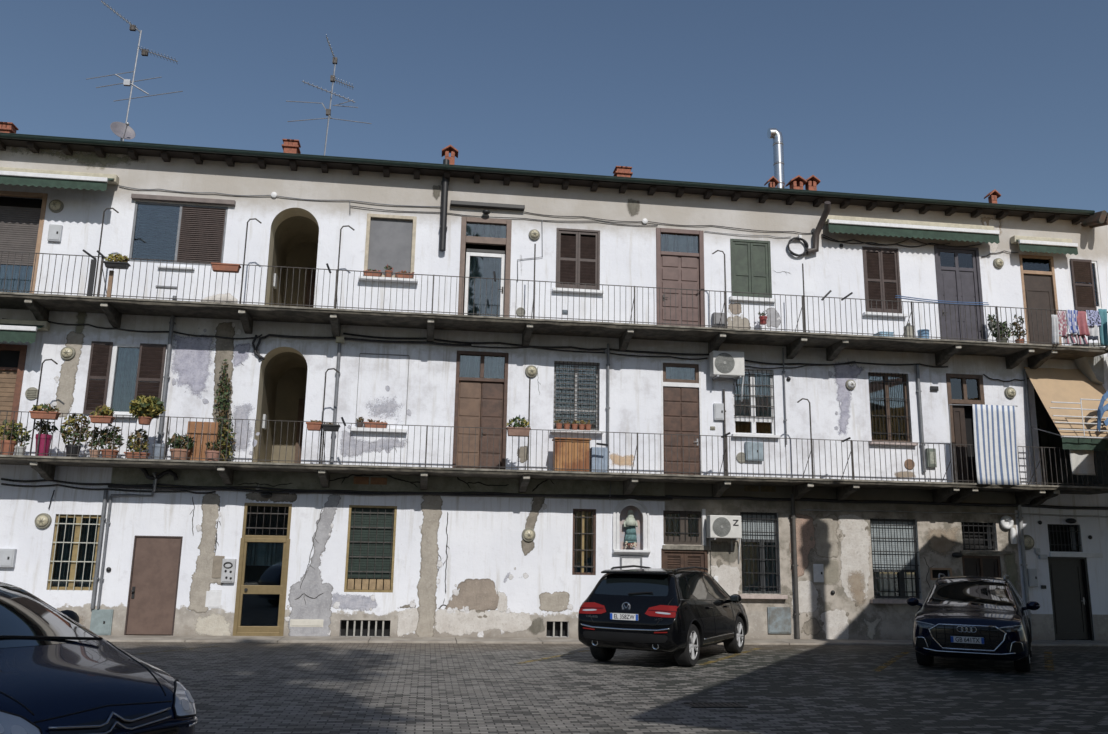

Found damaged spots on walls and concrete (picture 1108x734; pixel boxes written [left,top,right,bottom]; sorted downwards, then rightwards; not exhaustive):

peeling [51,331,85,418]
peeling [172,322,259,457]
peeling [829,358,862,435]
peeling [187,493,223,613]
peeling [284,494,377,636]
peeling [397,495,573,637]
peeling [785,511,871,639]